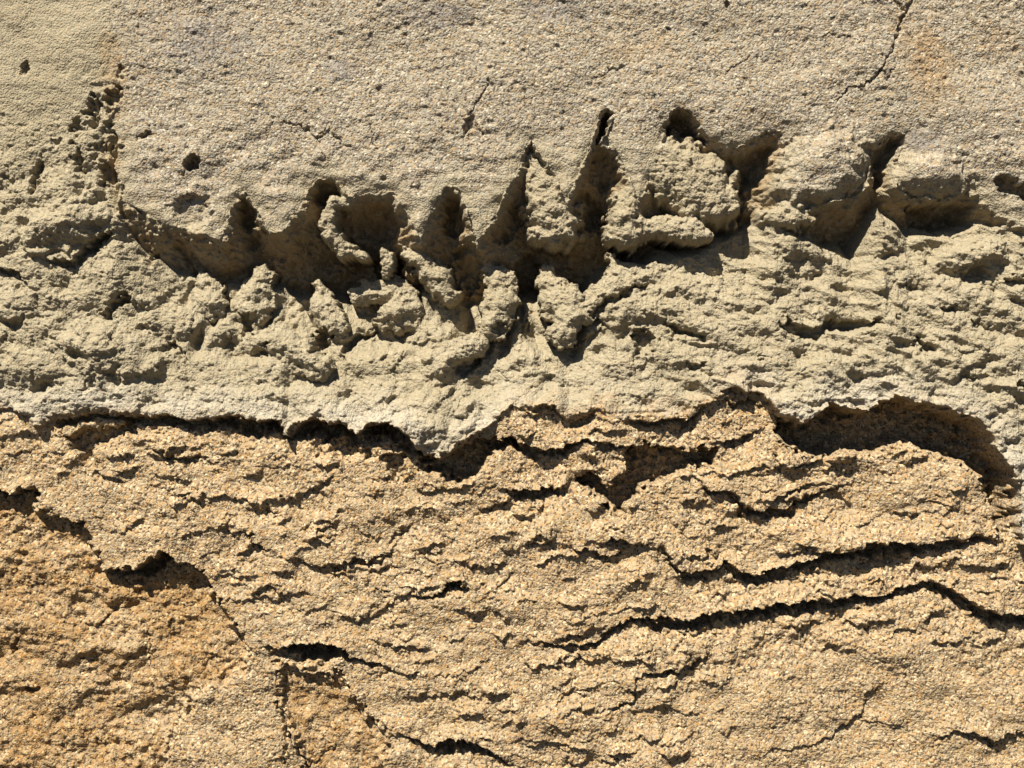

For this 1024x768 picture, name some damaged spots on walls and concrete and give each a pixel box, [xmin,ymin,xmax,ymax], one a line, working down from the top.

crack [822,32,862,44]
crack [837,0,915,103]
spalling [0,0,1024,546]
spalling [0,475,521,768]
peeling [590,639,713,720]
peeling [513,500,1024,658]